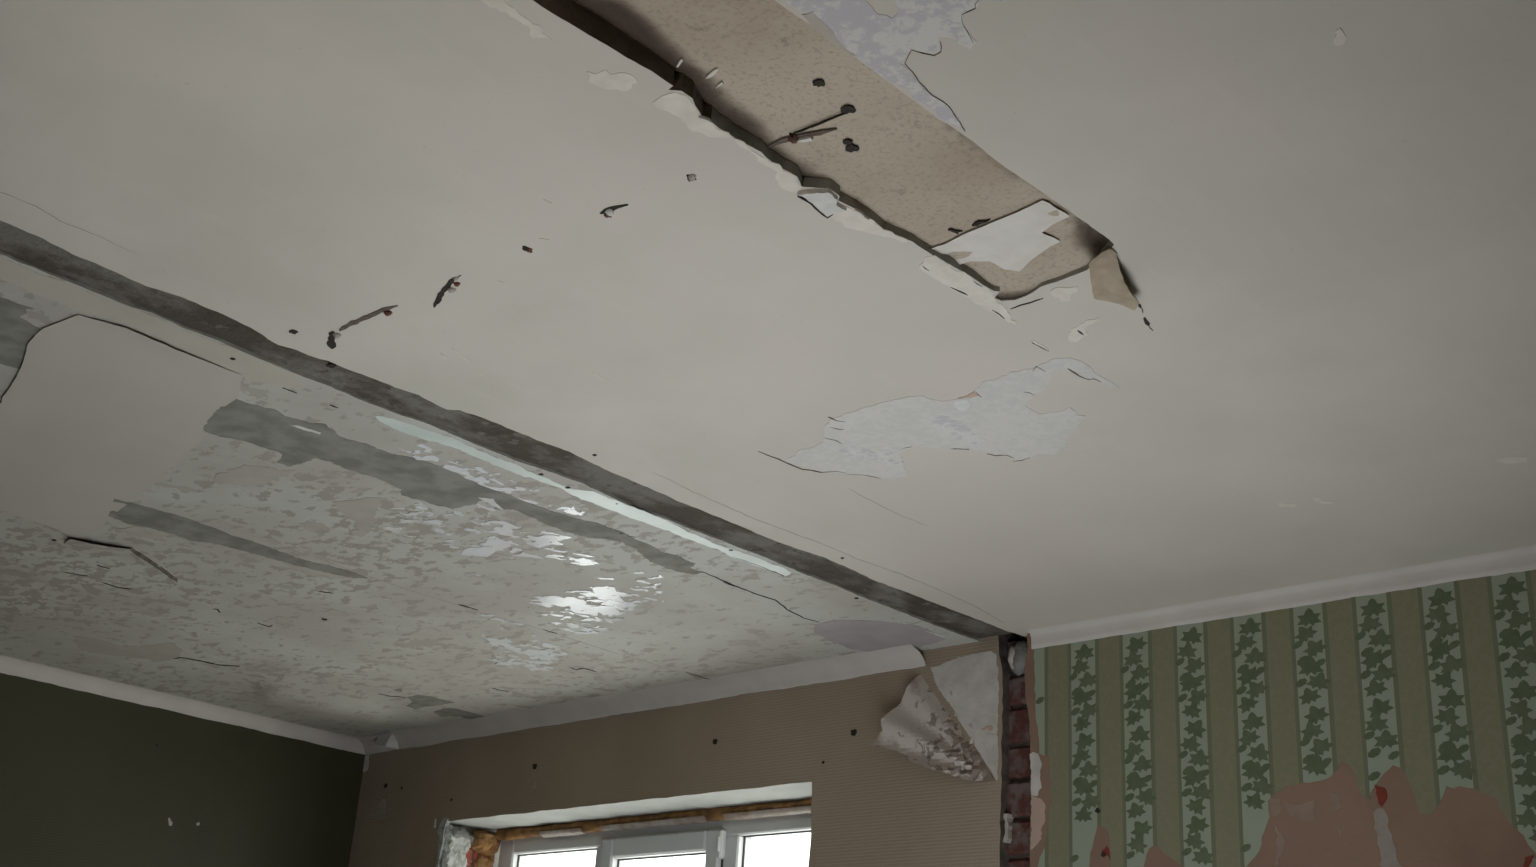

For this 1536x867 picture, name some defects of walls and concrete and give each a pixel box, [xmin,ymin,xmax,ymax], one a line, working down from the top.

peeling [785,0,1000,131]
peeling [653,92,908,242]
peeling [919,255,1078,325]
peeling [813,620,948,652]
flaking render [931,651,999,781]
flaking render [1373,808,1402,867]